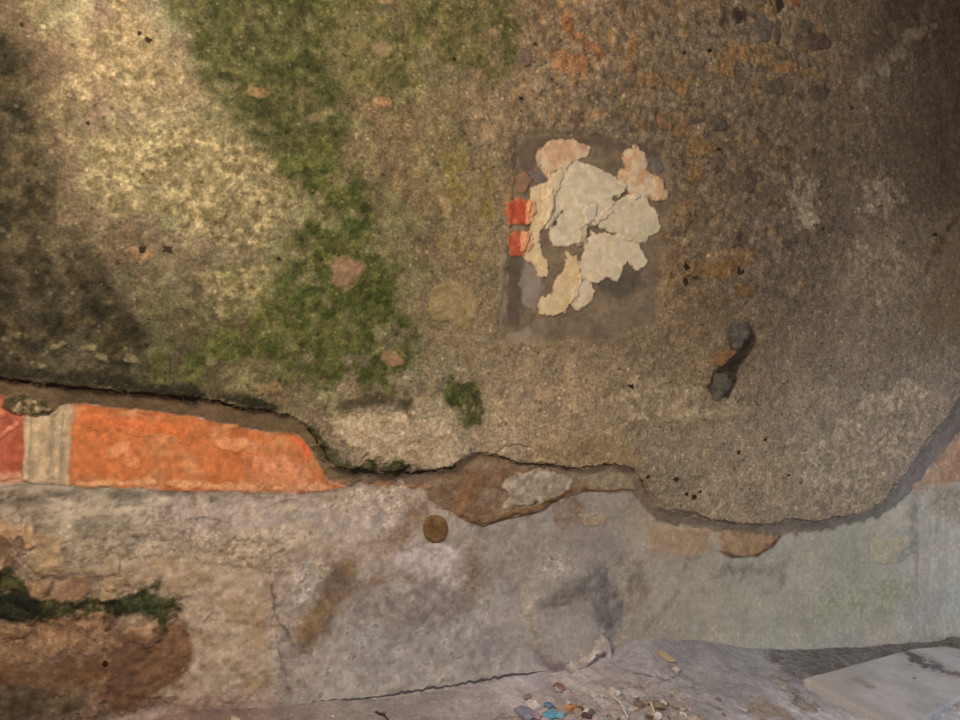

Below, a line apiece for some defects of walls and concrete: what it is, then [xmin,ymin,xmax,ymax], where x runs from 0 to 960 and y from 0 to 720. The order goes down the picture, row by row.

damp [0,0,307,415]
damp [0,406,21,440]
damp [0,434,492,720]
crack [9,515,545,702]
crack [0,376,953,603]
spalling [328,456,637,534]